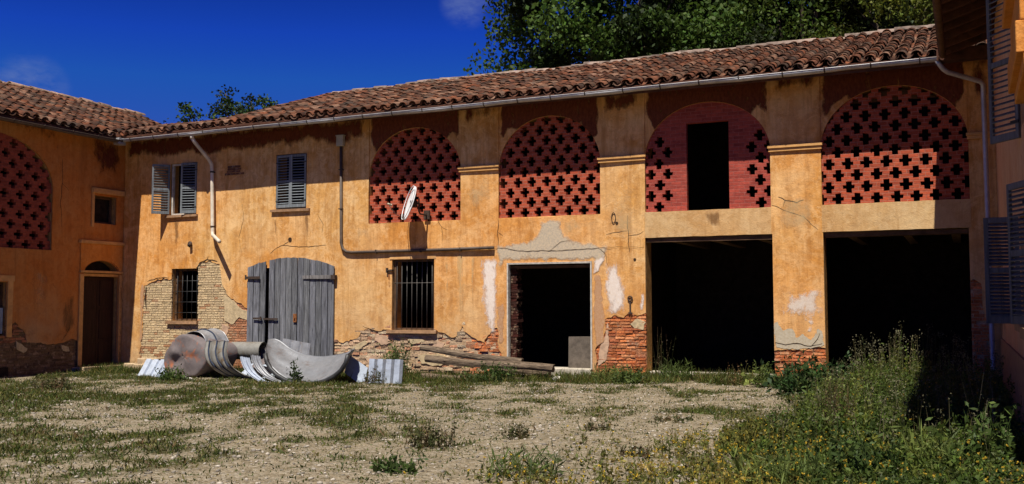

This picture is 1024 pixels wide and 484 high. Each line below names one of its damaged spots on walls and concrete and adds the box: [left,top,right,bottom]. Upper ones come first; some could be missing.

spalling [140,261,247,359]
spalling [0,323,77,376]
spalling [334,322,502,374]
spalling [595,313,647,373]
peeling [774,321,826,375]